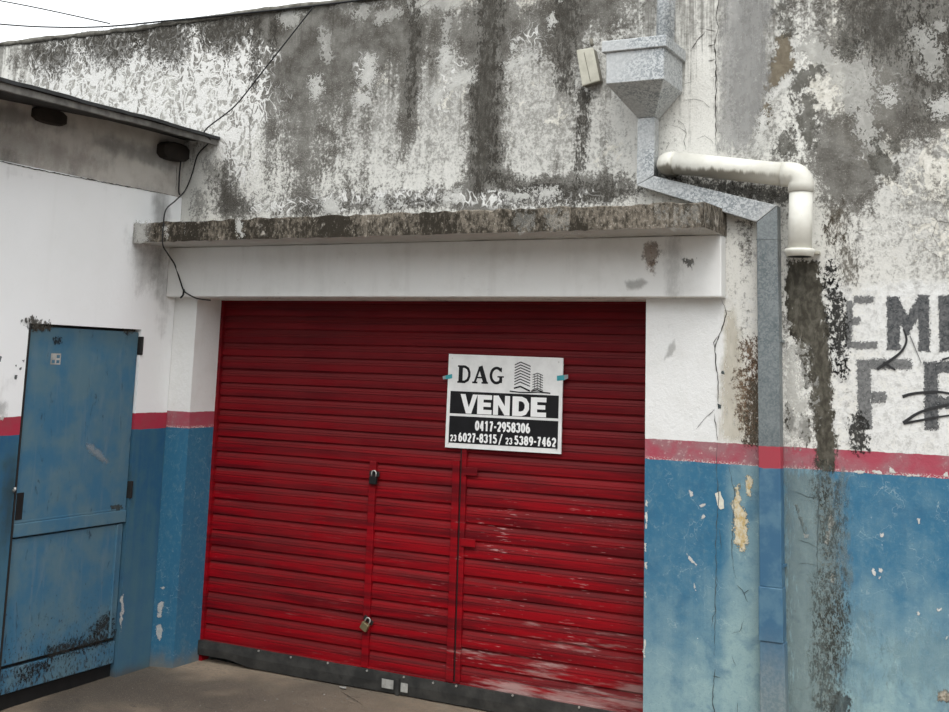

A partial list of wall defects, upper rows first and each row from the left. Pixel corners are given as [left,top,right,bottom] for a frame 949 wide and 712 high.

leakage [28,10,279,92]
leakage [404,0,423,119]
leakage [468,0,645,209]
leakage [290,192,443,217]
crack [713,302,727,385]
leakage [743,375,758,447]
spalling [689,475,753,552]
crack [696,410,748,712]
crack [796,469,830,571]